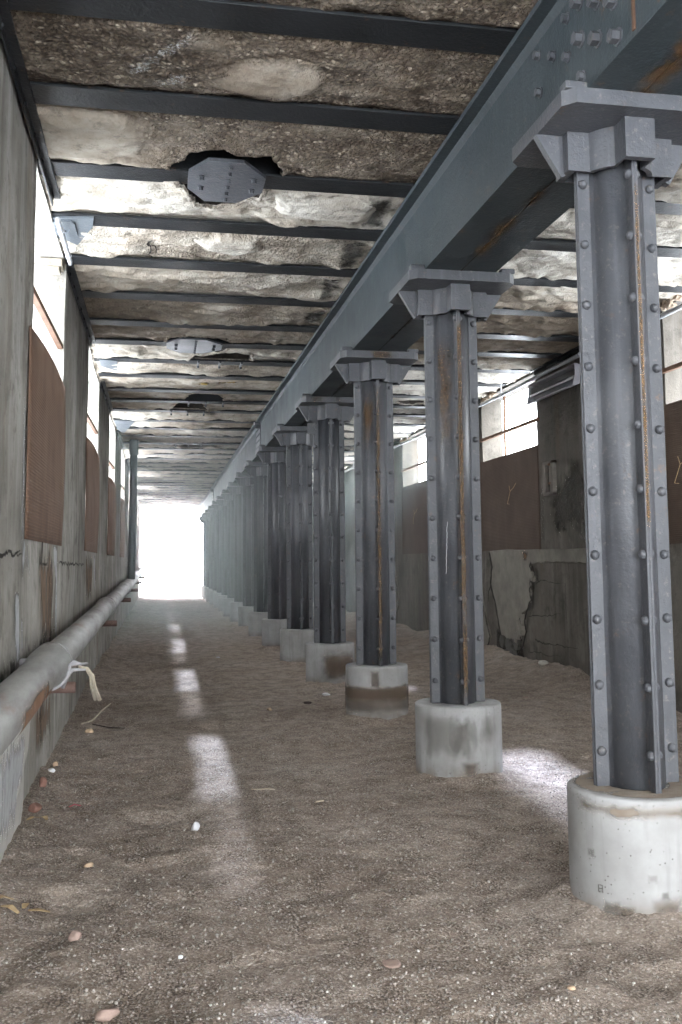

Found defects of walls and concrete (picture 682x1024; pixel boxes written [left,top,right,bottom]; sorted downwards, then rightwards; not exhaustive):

spalling [160,144,291,210]
corrosion [636,206,650,520]
crack [0,542,84,569]
corrosion [438,326,468,692]
peeling [483,548,586,657]